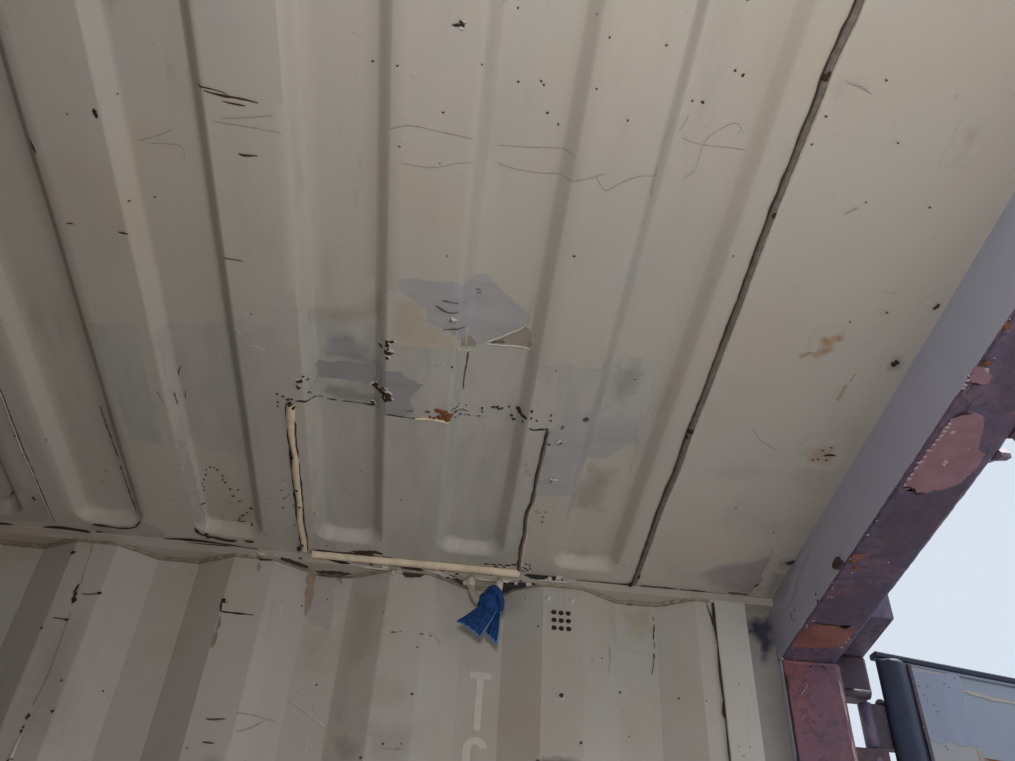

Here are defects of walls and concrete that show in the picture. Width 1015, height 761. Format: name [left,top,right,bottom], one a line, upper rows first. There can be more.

rust [425,402,564,431]
peeling [903,412,986,495]
peeling [961,357,996,390]
rust [965,316,1015,439]
rust [808,475,975,628]
peeling [791,620,855,648]
rust [785,673,800,761]